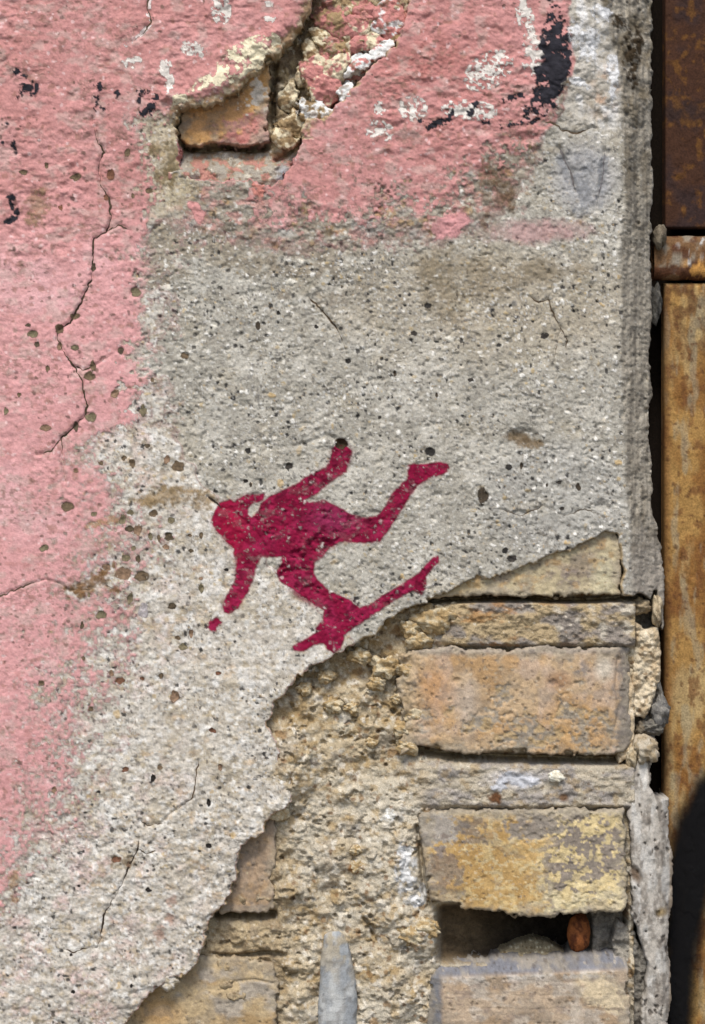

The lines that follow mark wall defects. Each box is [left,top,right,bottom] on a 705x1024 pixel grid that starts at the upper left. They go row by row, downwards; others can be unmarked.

peeling [122,0,544,275]
peeling [543,76,571,125]
crack [36,118,127,477]
peeling [0,287,636,1024]
crack [66,762,199,953]